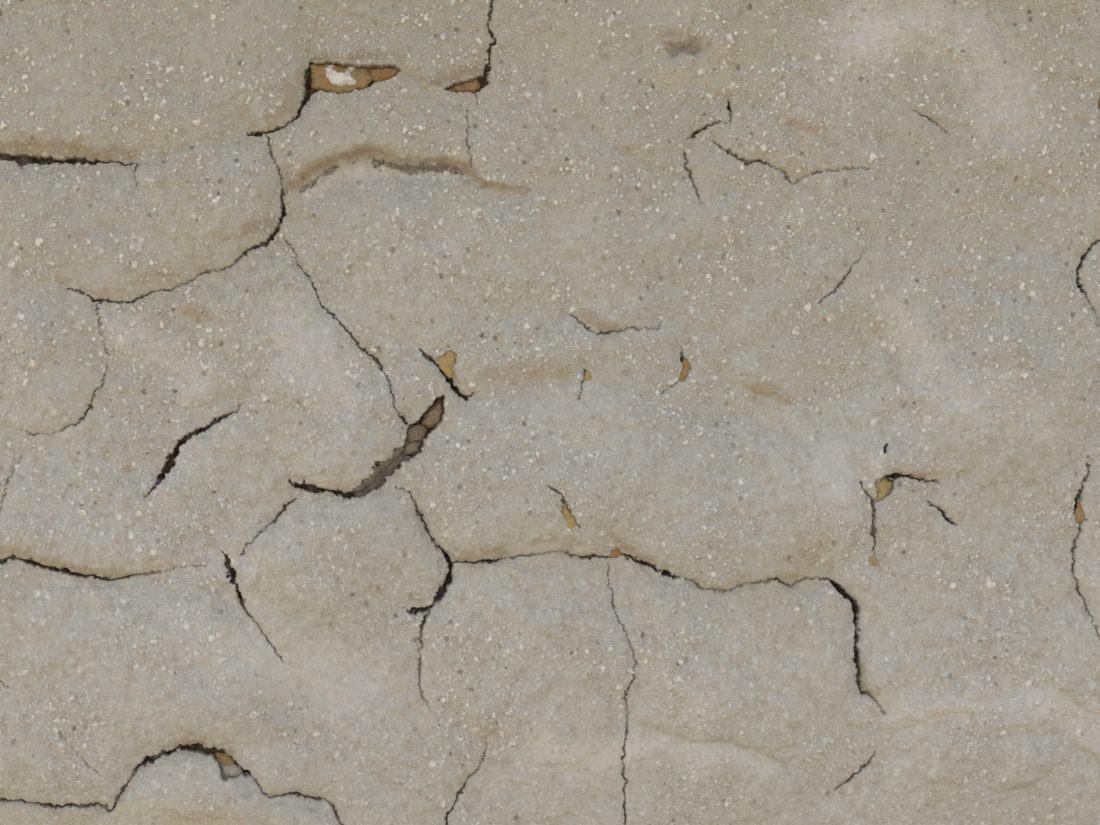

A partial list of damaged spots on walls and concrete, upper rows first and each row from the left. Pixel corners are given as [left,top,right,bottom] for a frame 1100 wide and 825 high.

spalling [303,60,402,101]
crack [465,0,497,168]
crack [909,107,951,136]
crack [1076,240,1100,326]
spalling [436,349,458,378]
spalling [401,394,446,459]
crack [0,62,886,825]
spalling [874,476,896,504]
crack [860,472,958,554]
crack [1070,462,1100,639]